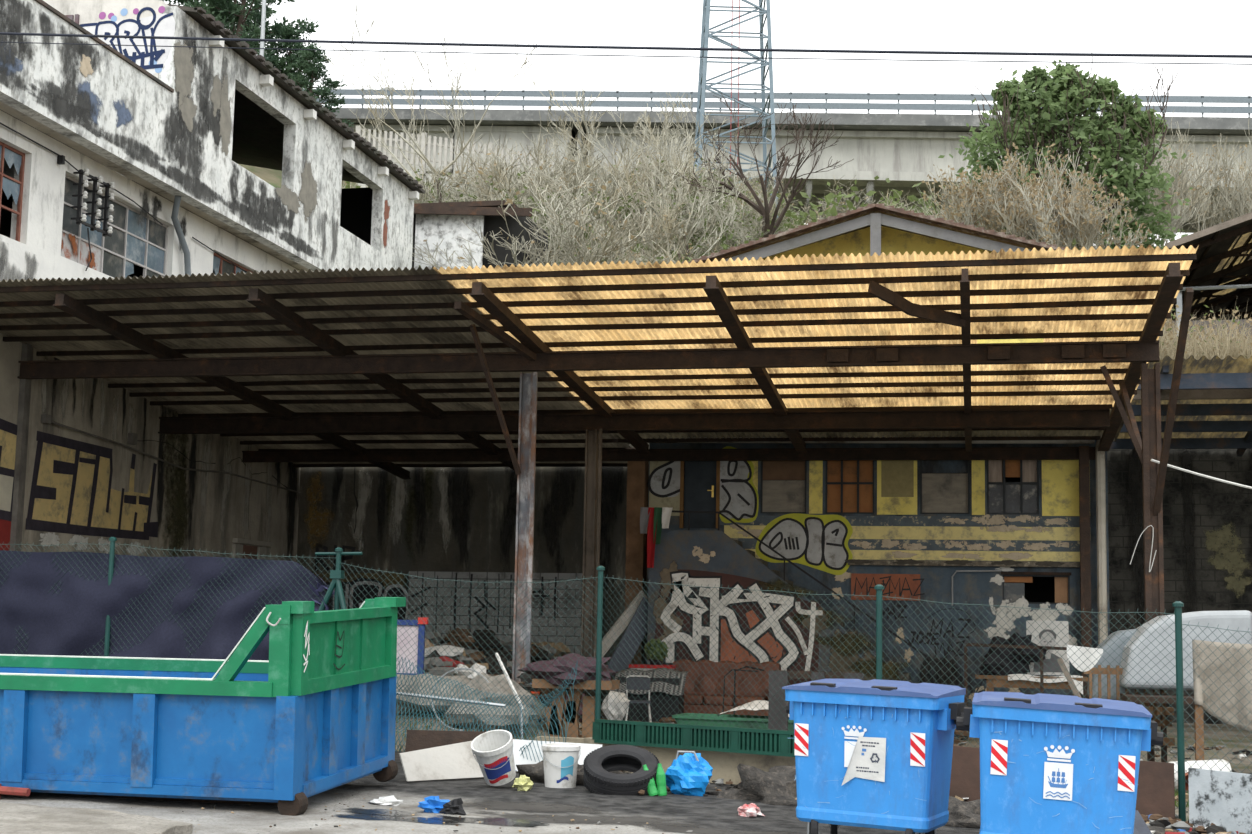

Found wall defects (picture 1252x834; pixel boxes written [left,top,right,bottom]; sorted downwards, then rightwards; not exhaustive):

water stain [0,0,338,258]
water stain [0,242,36,281]
water stain [42,378,211,552]
water stain [266,462,344,561]
water stain [352,467,473,566]
water stain [500,467,517,565]
water stain [543,467,581,571]
water stain [596,467,623,580]
peeling [942,514,1073,639]
water stain [1124,449,1145,625]
water stain [1178,449,1252,612]
flaking render [801,607,914,681]